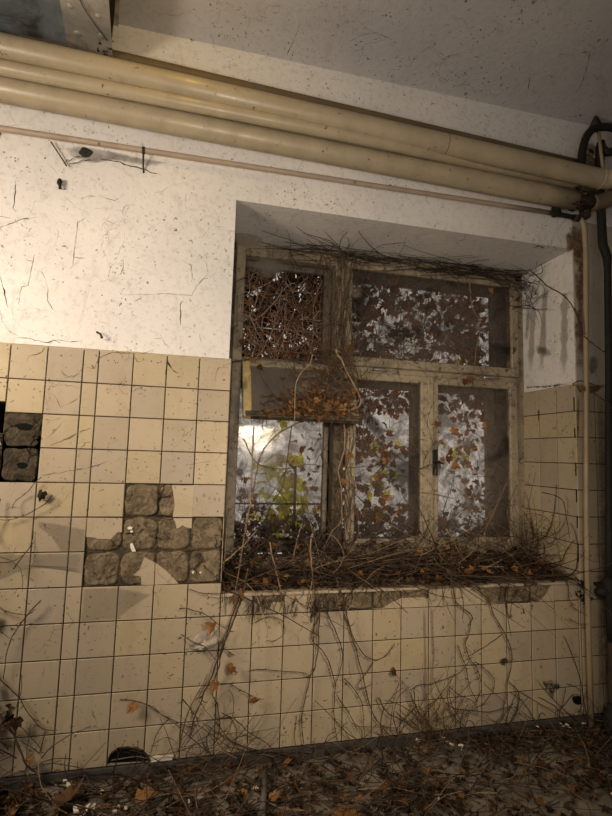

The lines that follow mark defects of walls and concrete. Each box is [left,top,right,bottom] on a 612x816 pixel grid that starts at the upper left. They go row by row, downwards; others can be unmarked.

crack [0,254,77,343]
crack [119,258,208,343]
spalling [0,412,43,482]
spalling [83,484,223,586]